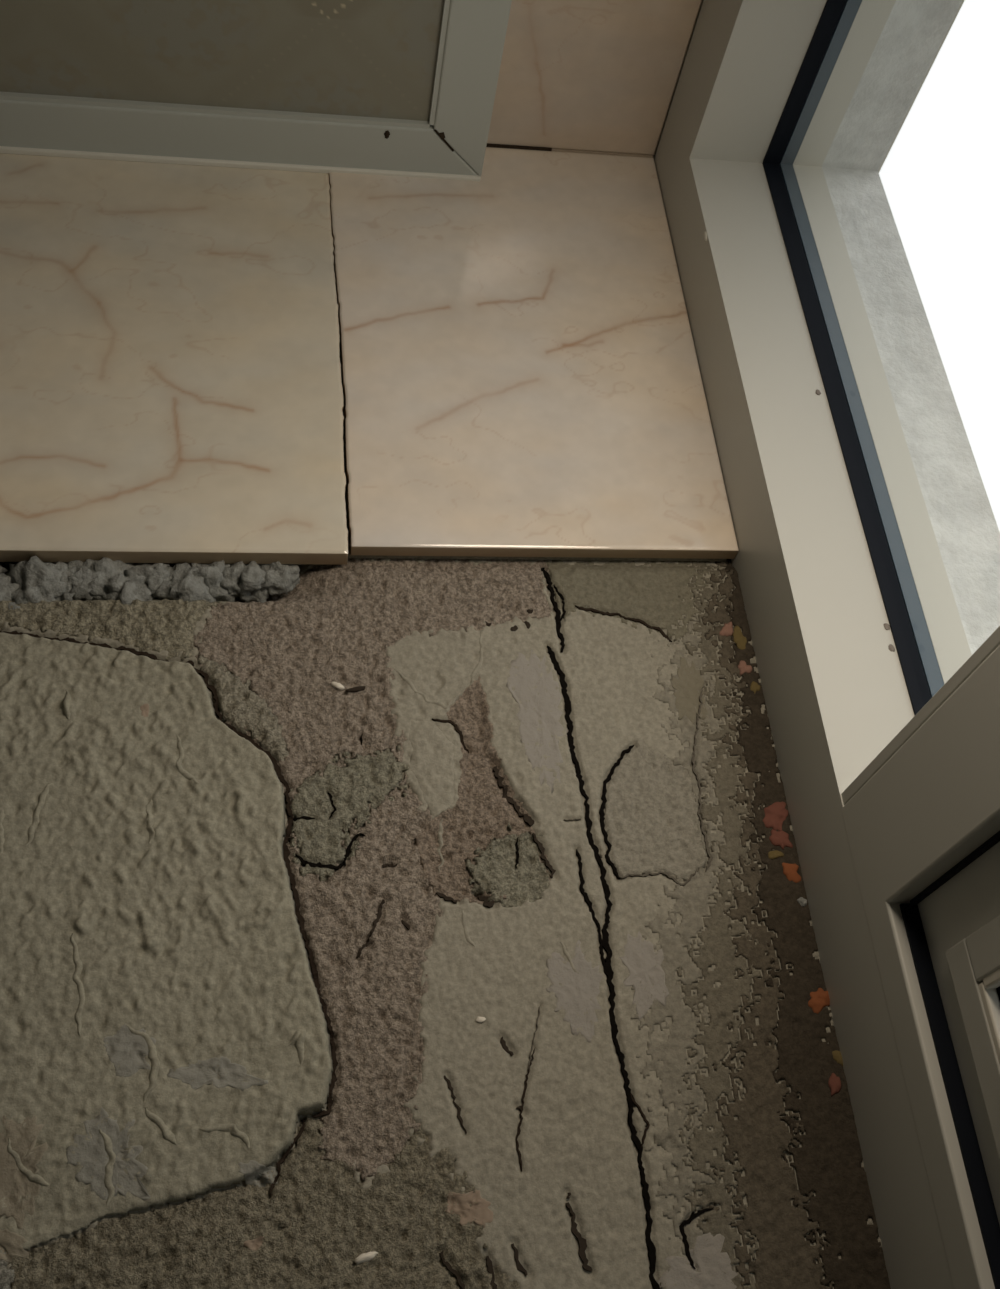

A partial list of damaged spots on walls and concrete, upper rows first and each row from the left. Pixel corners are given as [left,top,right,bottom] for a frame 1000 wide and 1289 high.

spalling [599,738,707,881]
spalling [5,558,556,1289]
crack [541,568,714,1289]
crack [516,1005,541,1172]
spalling [565,1192,592,1271]